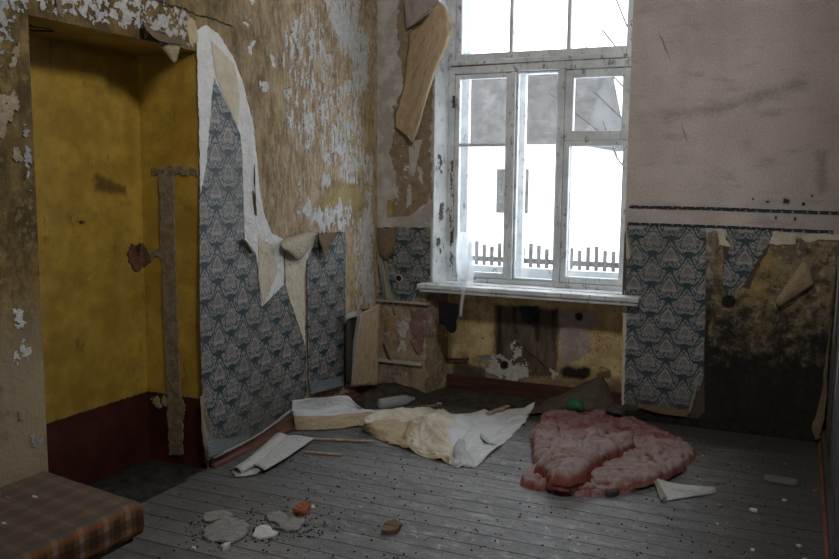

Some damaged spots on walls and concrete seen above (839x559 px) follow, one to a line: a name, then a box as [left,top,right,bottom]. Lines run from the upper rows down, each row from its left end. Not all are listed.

peeling [0,0,197,68]
spalling [0,90,20,139]
peeling [11,124,34,195]
peeling [269,0,376,310]
peeling [389,0,454,267]
peeling [12,309,27,329]
peeling [13,338,32,366]
spalling [478,340,530,381]
flaking render [549,309,597,380]
water stain [698,231,839,432]